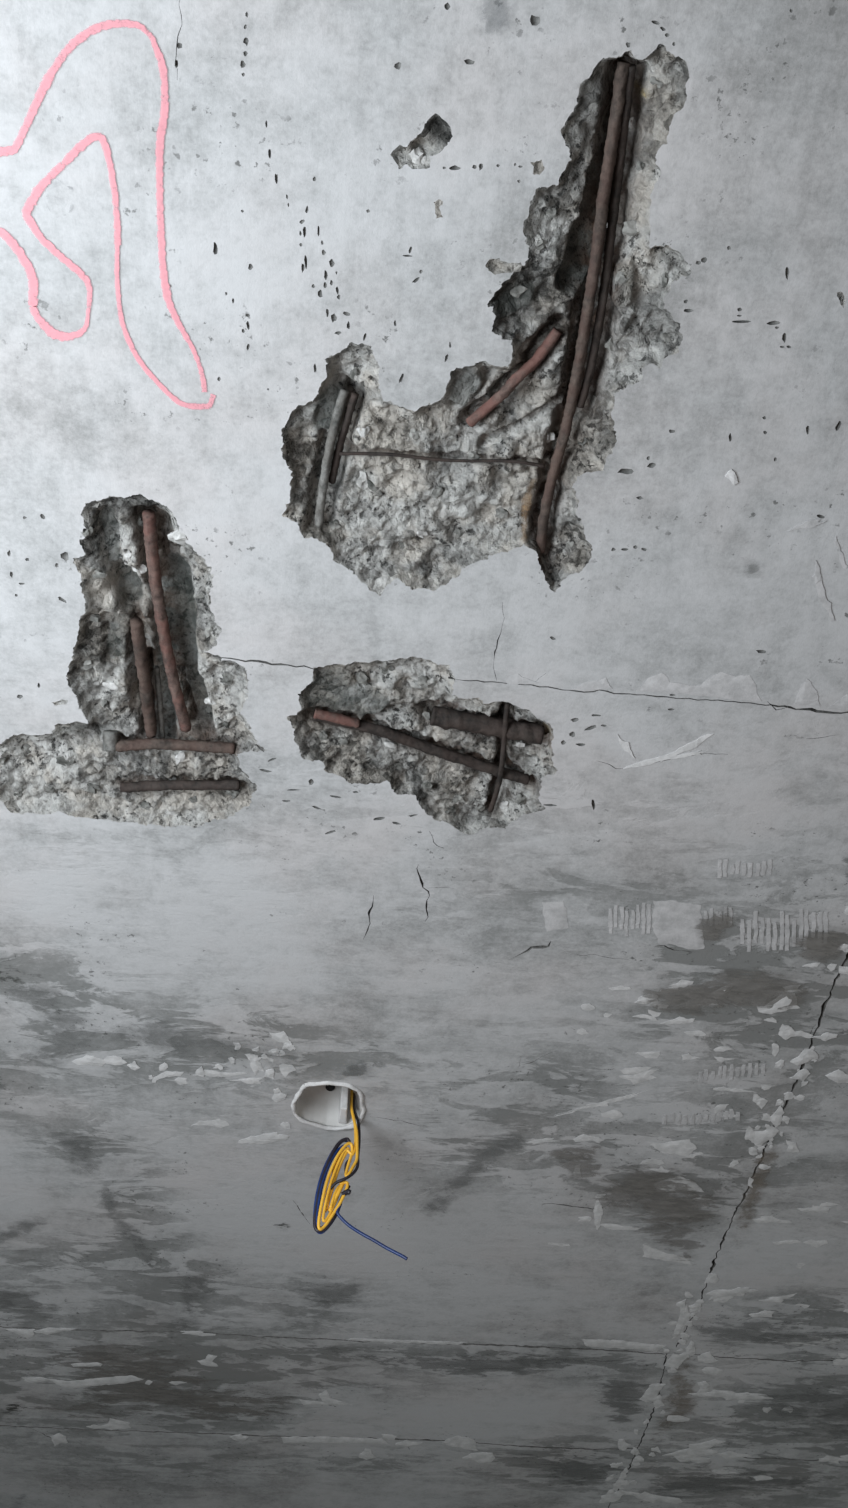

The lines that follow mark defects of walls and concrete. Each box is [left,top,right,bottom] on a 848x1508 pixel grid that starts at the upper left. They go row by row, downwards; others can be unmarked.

spalling [268,20,707,596]
spalling [732,308,791,348]
spalling [0,494,276,828]
crack [212,655,318,671]
crack [448,602,848,739]
spalling [282,656,613,835]
crack [417,831,454,920]
water stain [795,931,847,961]
water stain [646,971,806,1015]
crack [0,953,848,1508]
water stain [605,1169,717,1259]
water stain [51,1345,284,1419]